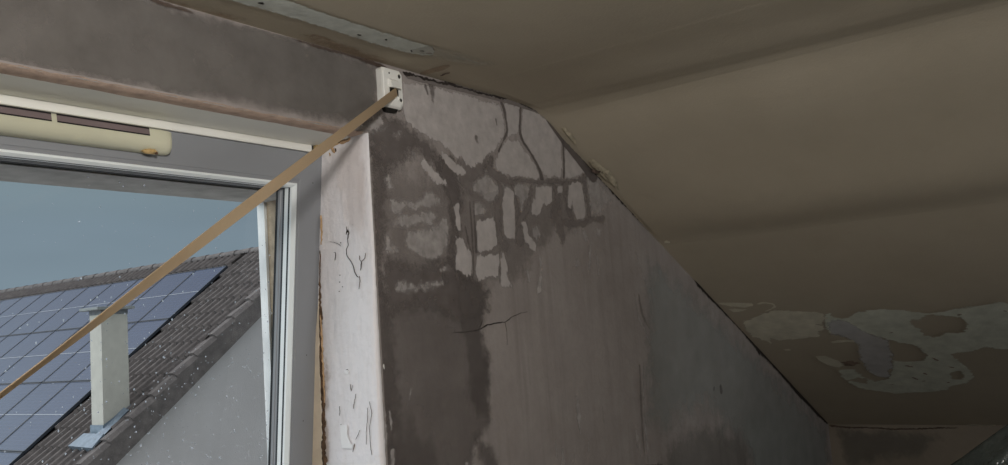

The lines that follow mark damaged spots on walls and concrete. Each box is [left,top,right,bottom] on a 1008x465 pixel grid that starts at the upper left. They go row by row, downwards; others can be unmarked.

crack [403,71,638,220]
water stain [0,0,613,465]
crack [318,215,372,465]
crack [453,312,525,341]
crack [695,281,956,430]
peeling [718,302,1008,394]